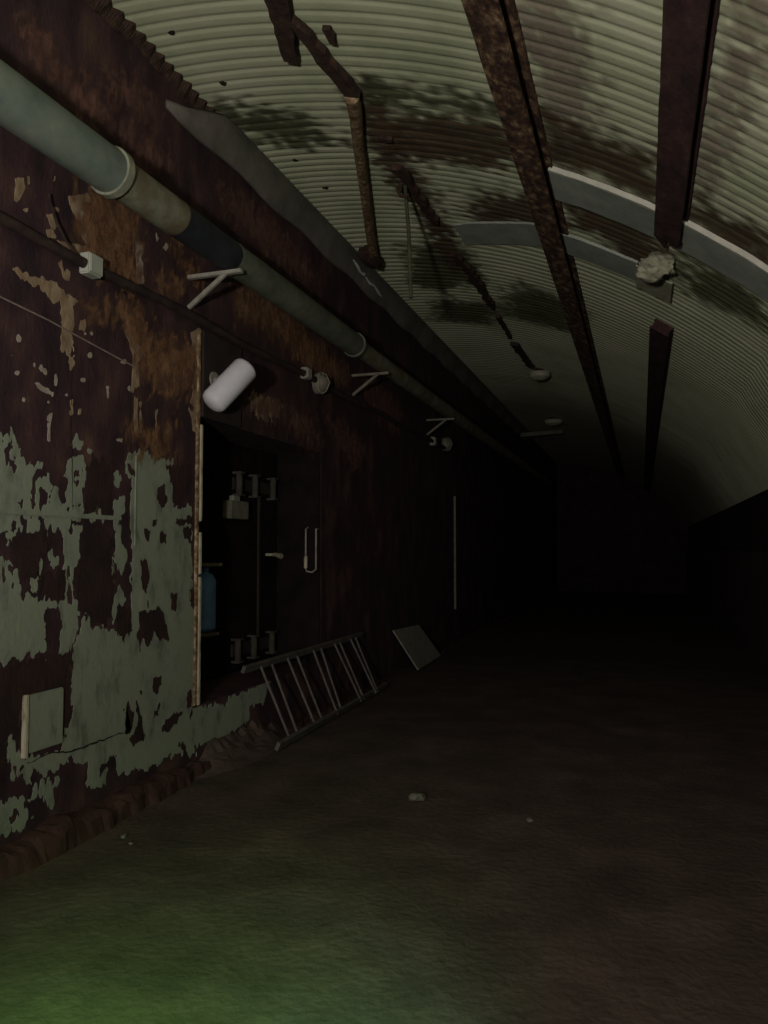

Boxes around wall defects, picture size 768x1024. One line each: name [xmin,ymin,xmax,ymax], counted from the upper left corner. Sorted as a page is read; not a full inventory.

peeling [14,176,30,212]
peeling [13,193,93,382]
peeling [33,363,82,442]
peeling [121,330,142,433]
rust [74,180,204,404]
peeling [189,330,201,432]
water stain [212,95,351,152]
water stain [352,74,569,332]
water stain [516,0,657,204]
water stain [561,203,768,334]
water stain [689,0,768,264]
peeling [0,427,270,838]